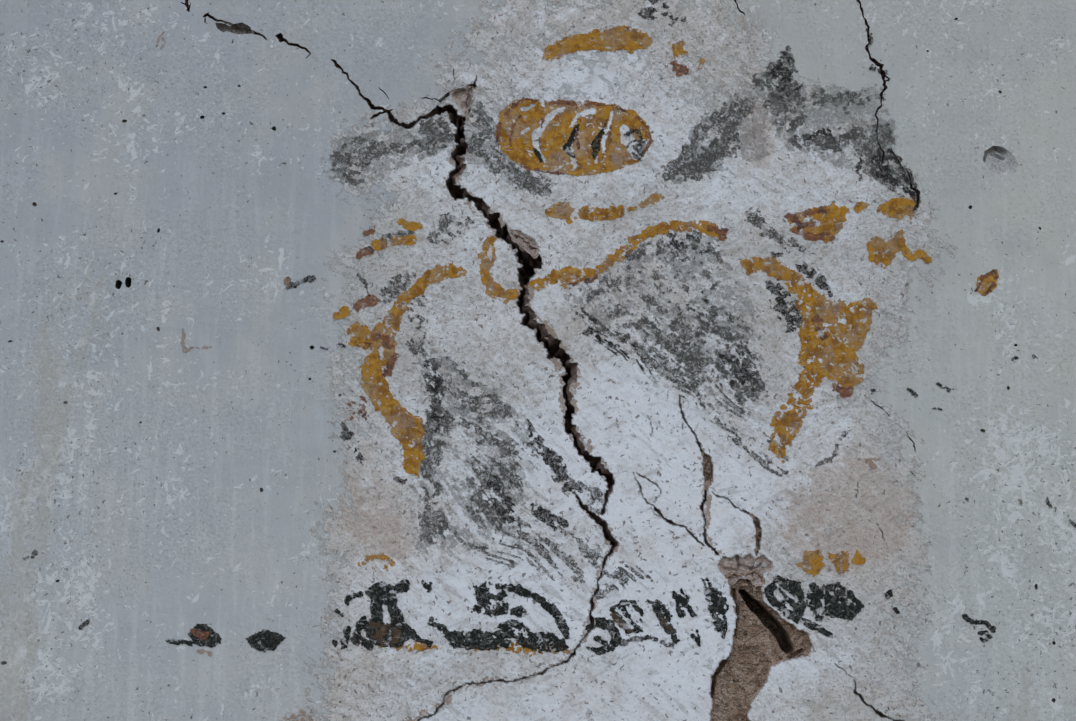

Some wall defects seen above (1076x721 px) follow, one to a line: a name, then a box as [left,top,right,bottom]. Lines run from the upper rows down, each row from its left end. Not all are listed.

crack [181,0,762,721]
peeling [298,0,956,721]
crack [856,0,920,209]